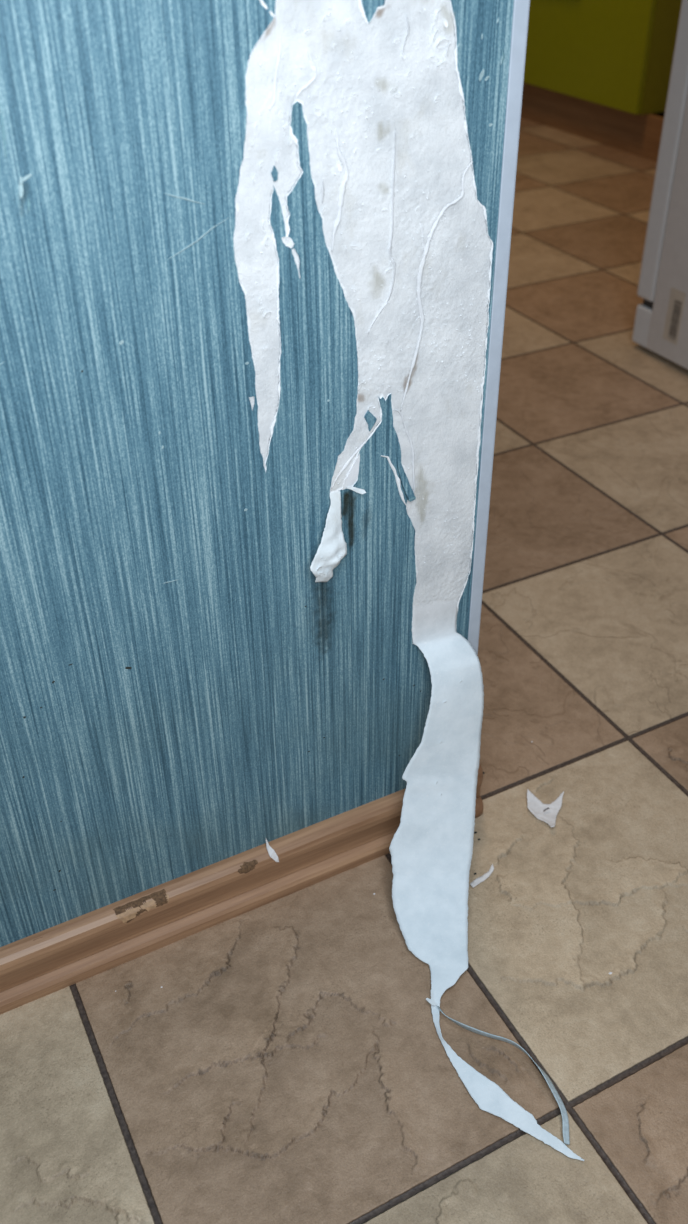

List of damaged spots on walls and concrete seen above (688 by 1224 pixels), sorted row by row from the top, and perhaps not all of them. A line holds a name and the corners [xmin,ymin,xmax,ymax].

peeling [233,0,493,626]